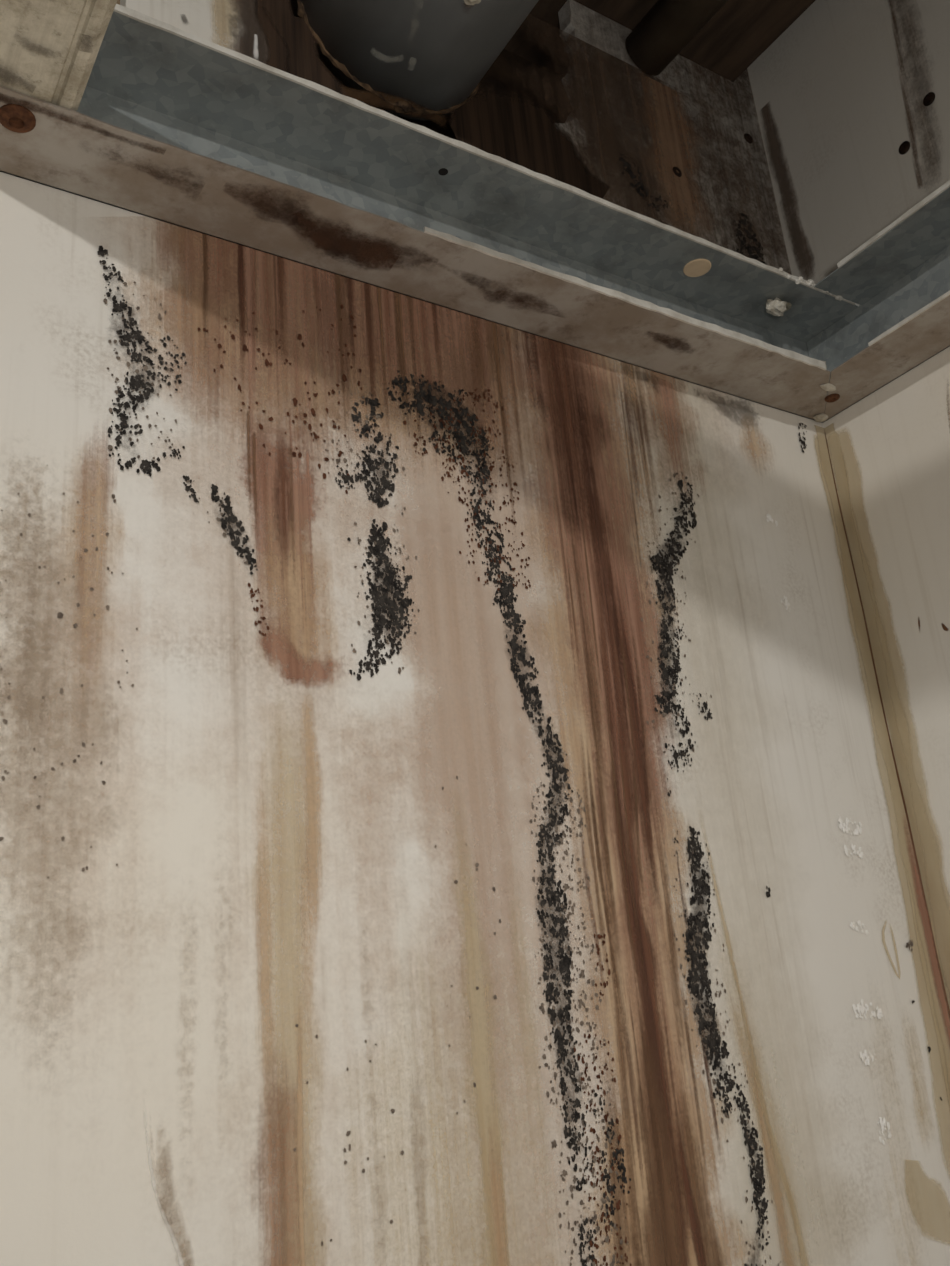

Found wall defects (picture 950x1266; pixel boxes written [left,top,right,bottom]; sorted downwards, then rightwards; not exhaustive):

corrosion [0,94,127,140]
damp [449,13,813,278]
damp [0,471,124,810]
damp [97,226,632,1266]
damp [623,362,713,797]
damp [674,826,808,1266]